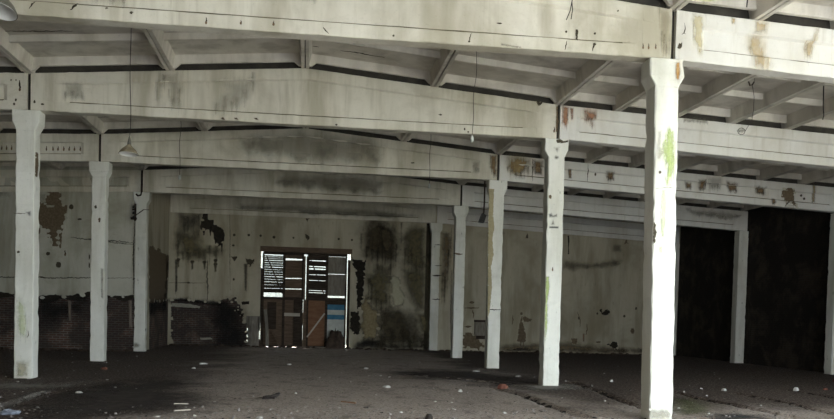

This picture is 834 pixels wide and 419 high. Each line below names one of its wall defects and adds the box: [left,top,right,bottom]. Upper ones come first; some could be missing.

rust [508,158,529,175]
peeling [39,192,74,256]
flaking render [0,292,15,349]
flaking render [38,292,91,350]
flaking render [107,295,139,351]
flaking render [145,244,247,349]
spalling [231,234,255,290]
damp [364,220,428,346]